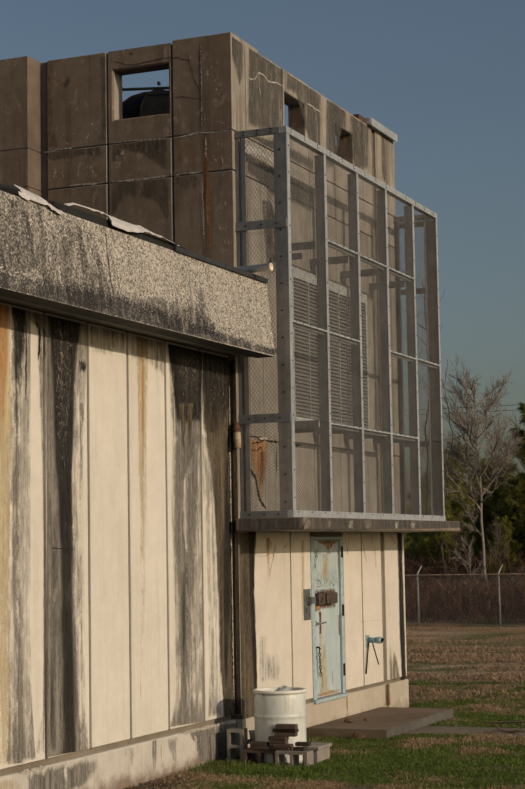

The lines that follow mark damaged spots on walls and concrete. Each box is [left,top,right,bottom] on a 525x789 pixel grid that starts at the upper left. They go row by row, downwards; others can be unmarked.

crack [110,41,202,127]
crack [245,47,284,109]
leakage [142,277,218,335]
corrosion [137,337,147,535]
leakage [7,307,124,789]
leakage [137,338,460,761]